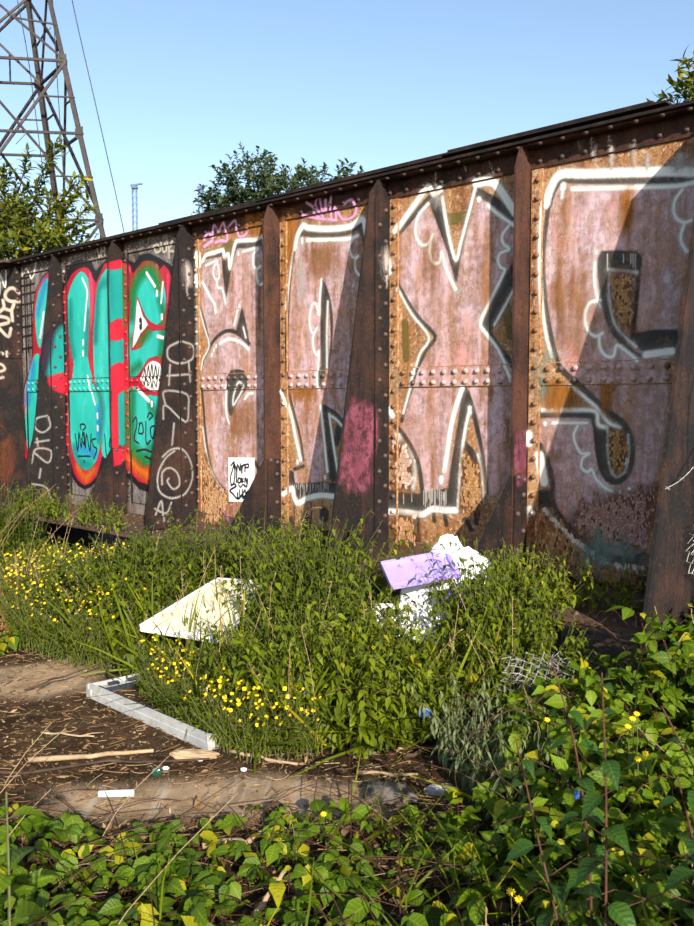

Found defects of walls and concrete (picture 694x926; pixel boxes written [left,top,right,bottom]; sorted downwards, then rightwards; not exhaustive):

rust [622,193,633,228]
rust [281,210,296,281]
rust [289,389,316,414]
rust [545,384,573,412]